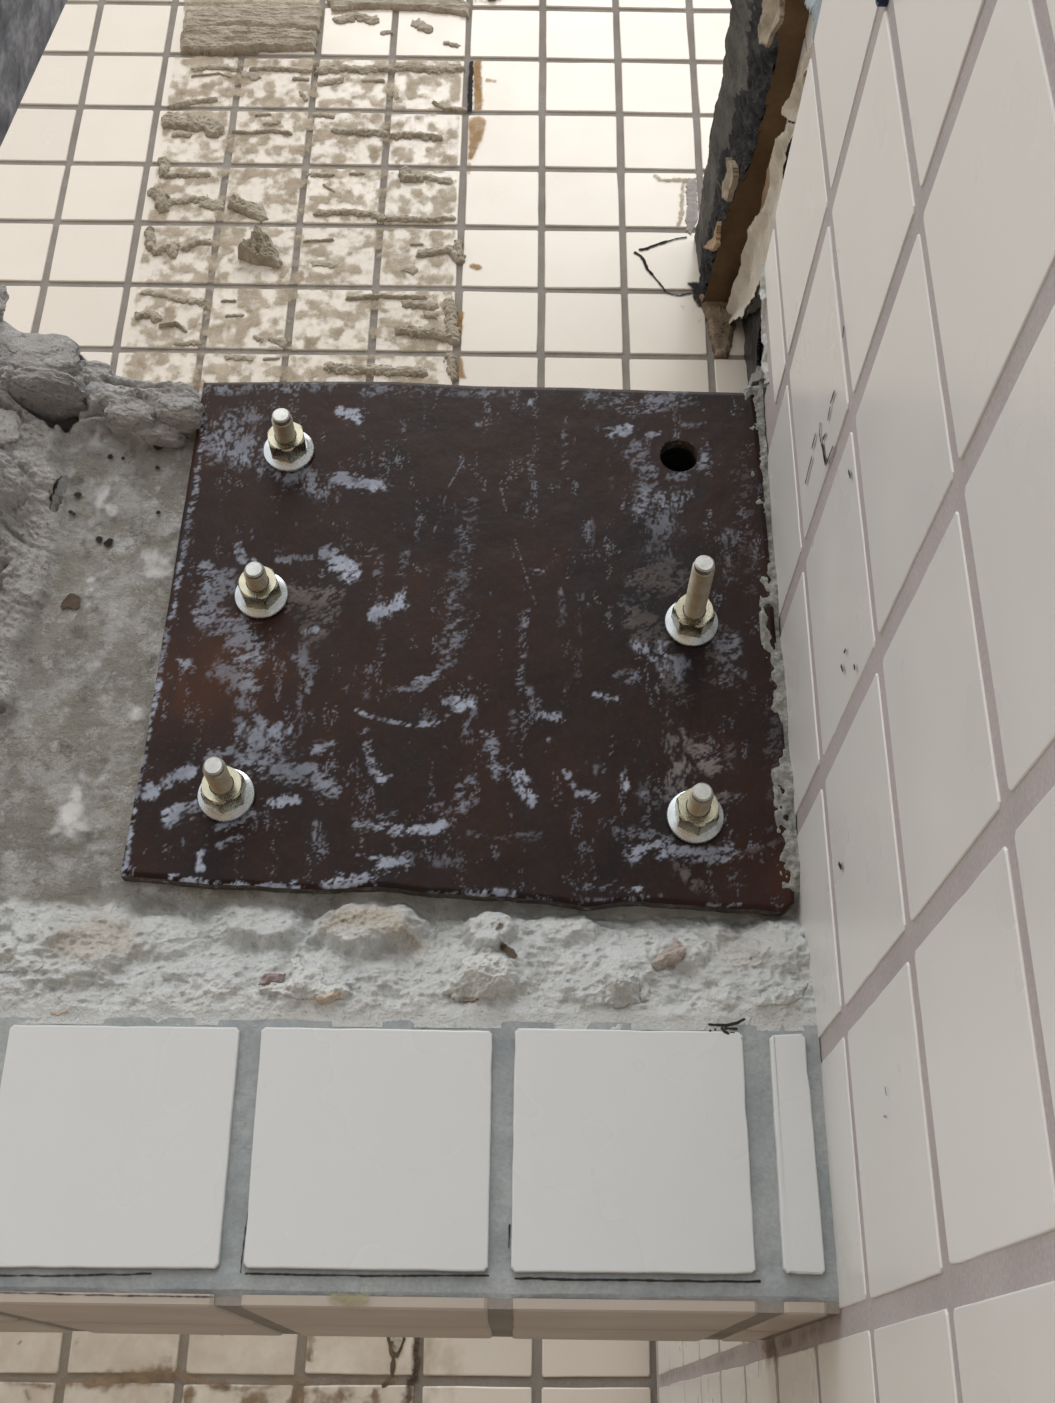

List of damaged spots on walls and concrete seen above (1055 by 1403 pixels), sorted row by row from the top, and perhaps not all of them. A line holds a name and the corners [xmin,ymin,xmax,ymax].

peeling [332,11,393,35]
peeling [410,18,461,48]
peeling [758,0,785,47]
peeling [722,157,739,202]
spalling [654,174,699,236]
peeling [704,221,721,252]
spalling [699,290,736,360]
spalling [759,263,769,384]
water stain [35,1369,230,1403]
water stain [242,1337,421,1403]